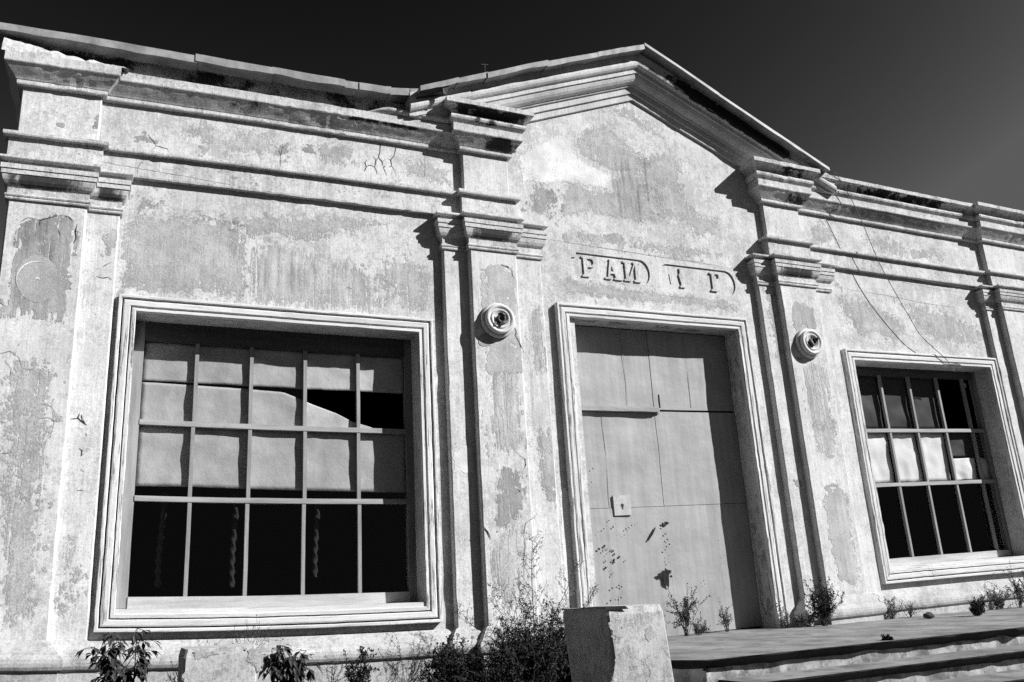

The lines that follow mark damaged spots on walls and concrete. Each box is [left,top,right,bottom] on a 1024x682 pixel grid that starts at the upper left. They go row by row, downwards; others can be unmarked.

crack [364,143,396,175]
spalling [0,214,81,324]
spalling [479,263,557,609]
peeling [824,483,861,586]